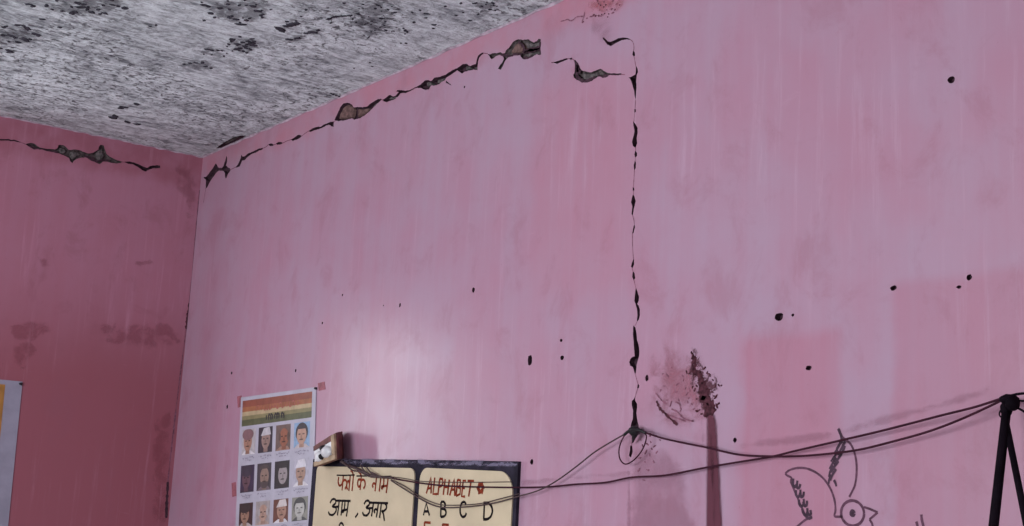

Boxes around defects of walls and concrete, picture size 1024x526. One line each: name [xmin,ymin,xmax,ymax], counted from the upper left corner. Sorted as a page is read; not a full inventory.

flaking render [487,39,541,70]
flaking render [551,58,625,83]
crack [0,139,160,171]
crack [603,38,693,457]
crack [165,53,487,518]